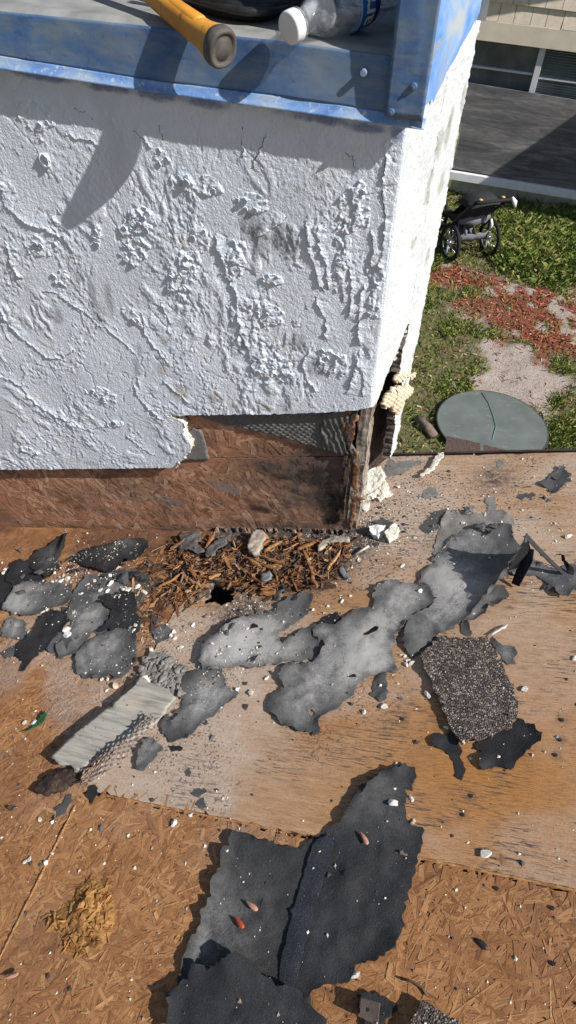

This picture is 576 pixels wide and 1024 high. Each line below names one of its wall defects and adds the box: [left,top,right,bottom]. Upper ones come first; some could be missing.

crack [241,127,275,173]
crack [214,141,407,397]